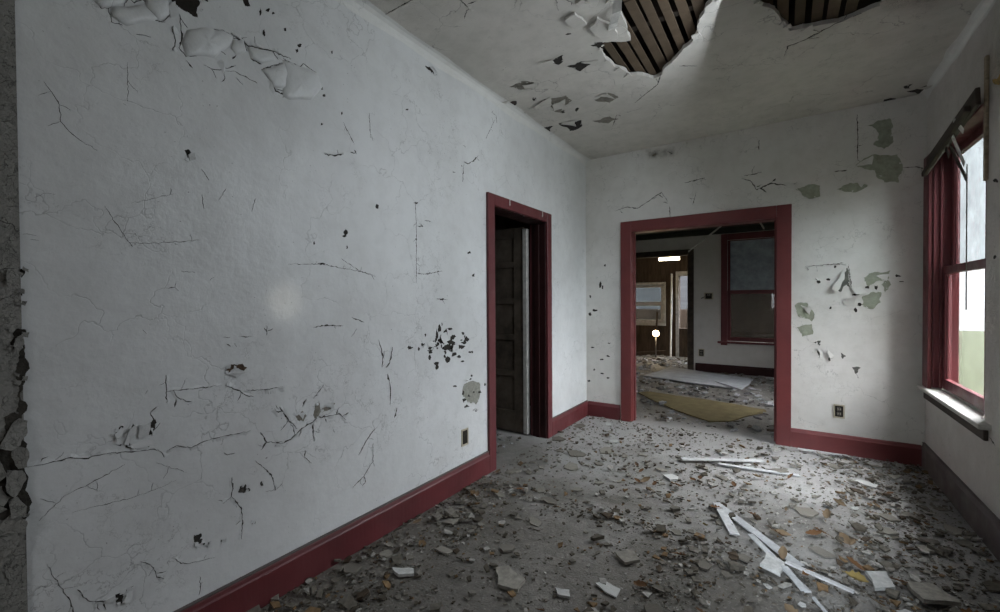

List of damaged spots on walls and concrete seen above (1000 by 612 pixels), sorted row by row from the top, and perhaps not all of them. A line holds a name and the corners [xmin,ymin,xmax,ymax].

flaking render [168,0,210,18]
flaking render [537,0,722,78]
flaking render [754,0,886,32]
crack [38,82,91,146]
crack [324,114,373,157]
peeling [502,81,618,131]
peeling [407,324,473,370]
crack [352,340,397,488]
flaking render [0,328,32,558]
crack [27,374,349,541]
crack [47,565,106,612]
crack [138,555,215,594]